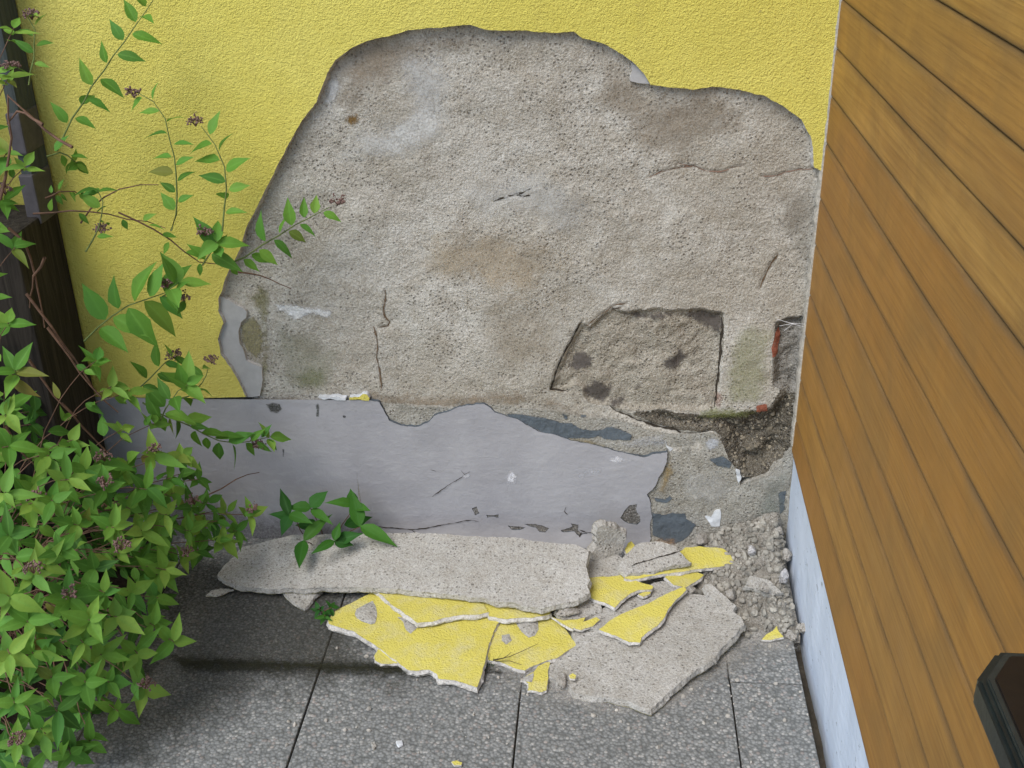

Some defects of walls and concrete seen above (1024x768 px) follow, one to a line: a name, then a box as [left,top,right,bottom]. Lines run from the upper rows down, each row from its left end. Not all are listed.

crack [649,163,739,178]
crack [764,168,814,177]
flaking render [218,25,819,550]
crack [373,291,390,390]
crack [550,303,626,391]
crack [610,317,724,435]